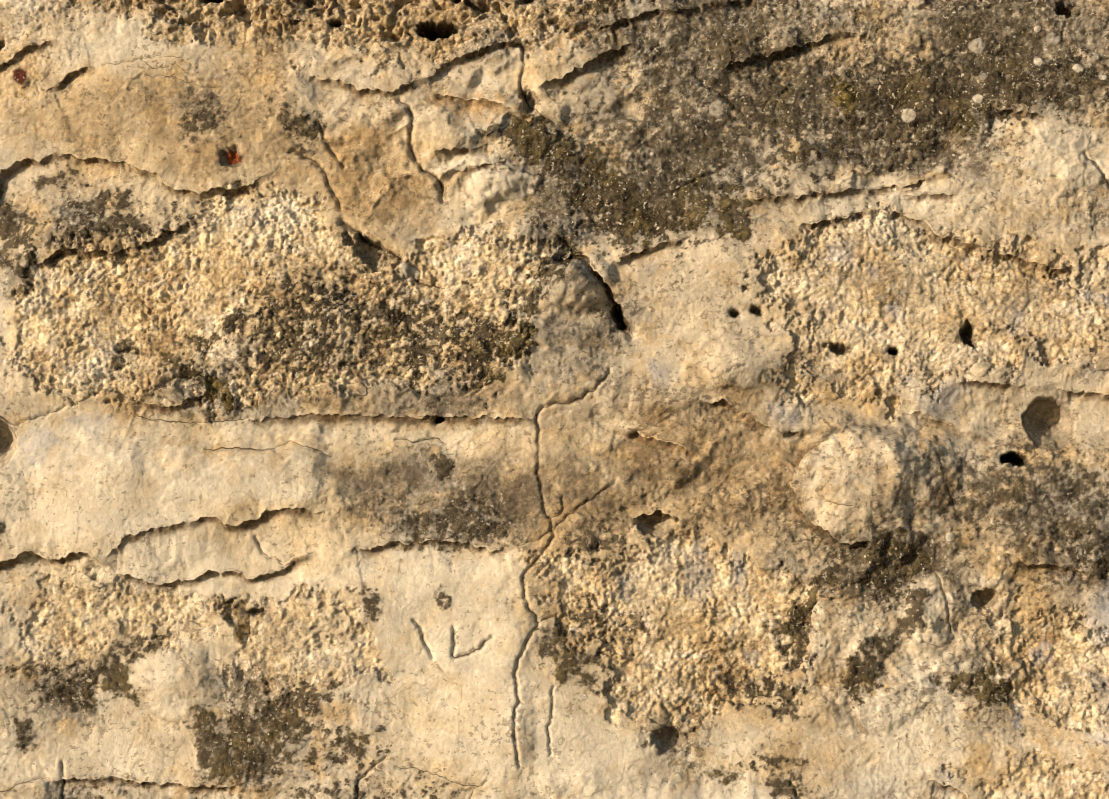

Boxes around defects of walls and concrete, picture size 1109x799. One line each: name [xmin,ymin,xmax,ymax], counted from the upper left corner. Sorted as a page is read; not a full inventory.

damp [286,0,328,24]
damp [552,0,622,29]
damp [489,114,576,164]
damp [698,40,1109,179]
damp [625,173,657,231]
damp [716,184,753,245]
crack [561,252,632,334]
crack [513,369,614,767]
spalling [0,496,394,708]